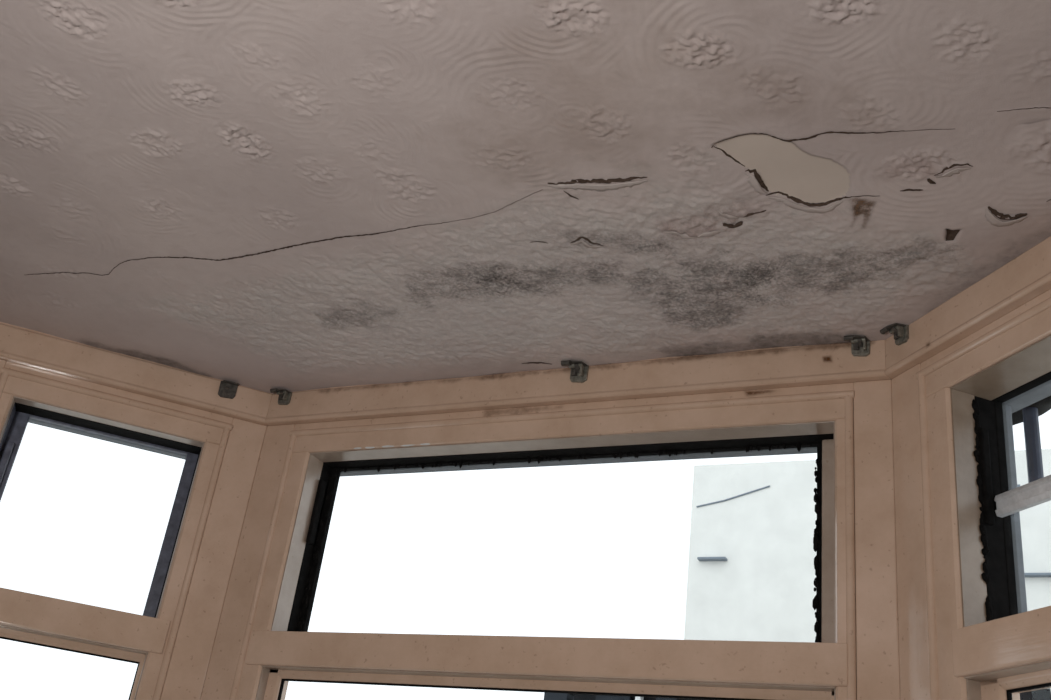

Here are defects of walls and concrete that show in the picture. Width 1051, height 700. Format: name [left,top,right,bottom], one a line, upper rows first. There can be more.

flaking render [713,134,851,213]
crack [27,177,647,276]
flaking render [985,209,1028,227]